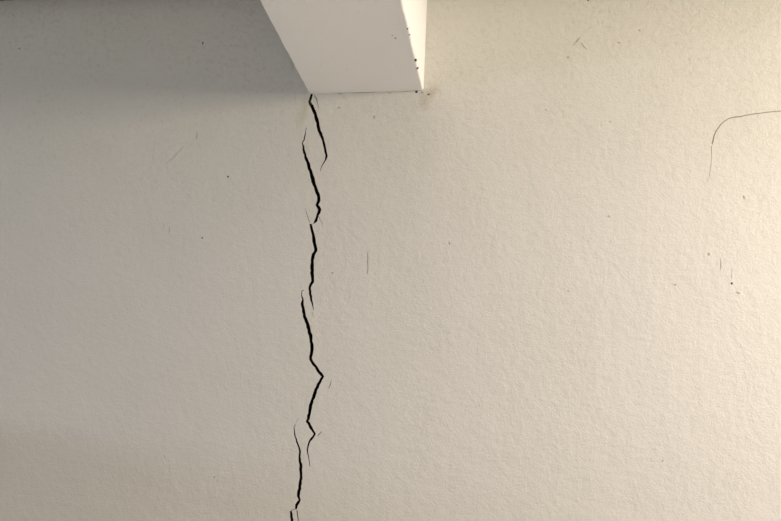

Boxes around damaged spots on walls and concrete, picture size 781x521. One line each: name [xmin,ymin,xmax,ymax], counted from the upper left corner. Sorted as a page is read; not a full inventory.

crack [290,94,331,521]